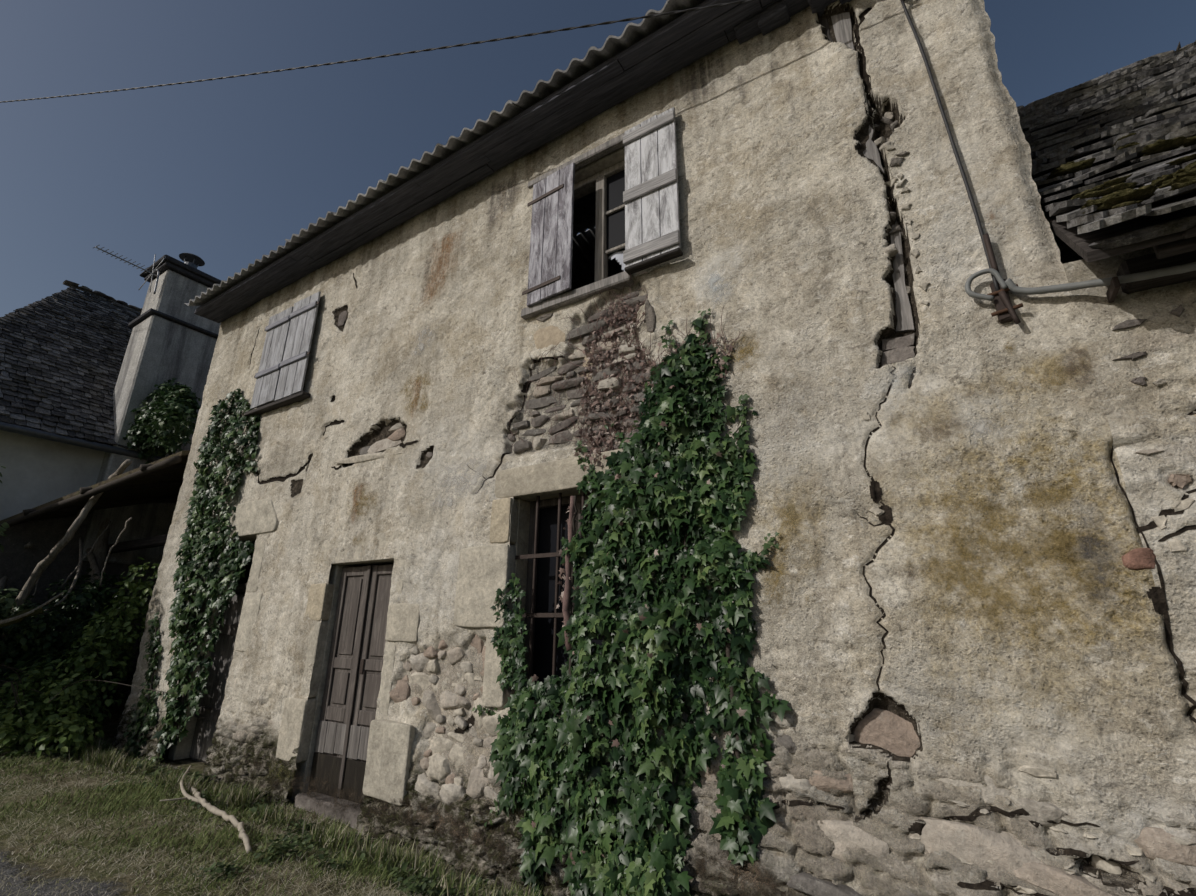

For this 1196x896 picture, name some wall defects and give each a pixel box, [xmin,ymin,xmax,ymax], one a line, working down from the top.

spalling [331,417,434,470]
spalling [501,273,667,454]
crack [816,3,930,692]
crack [1110,446,1196,723]
peeling [389,635,512,819]
peeling [752,692,1196,896]